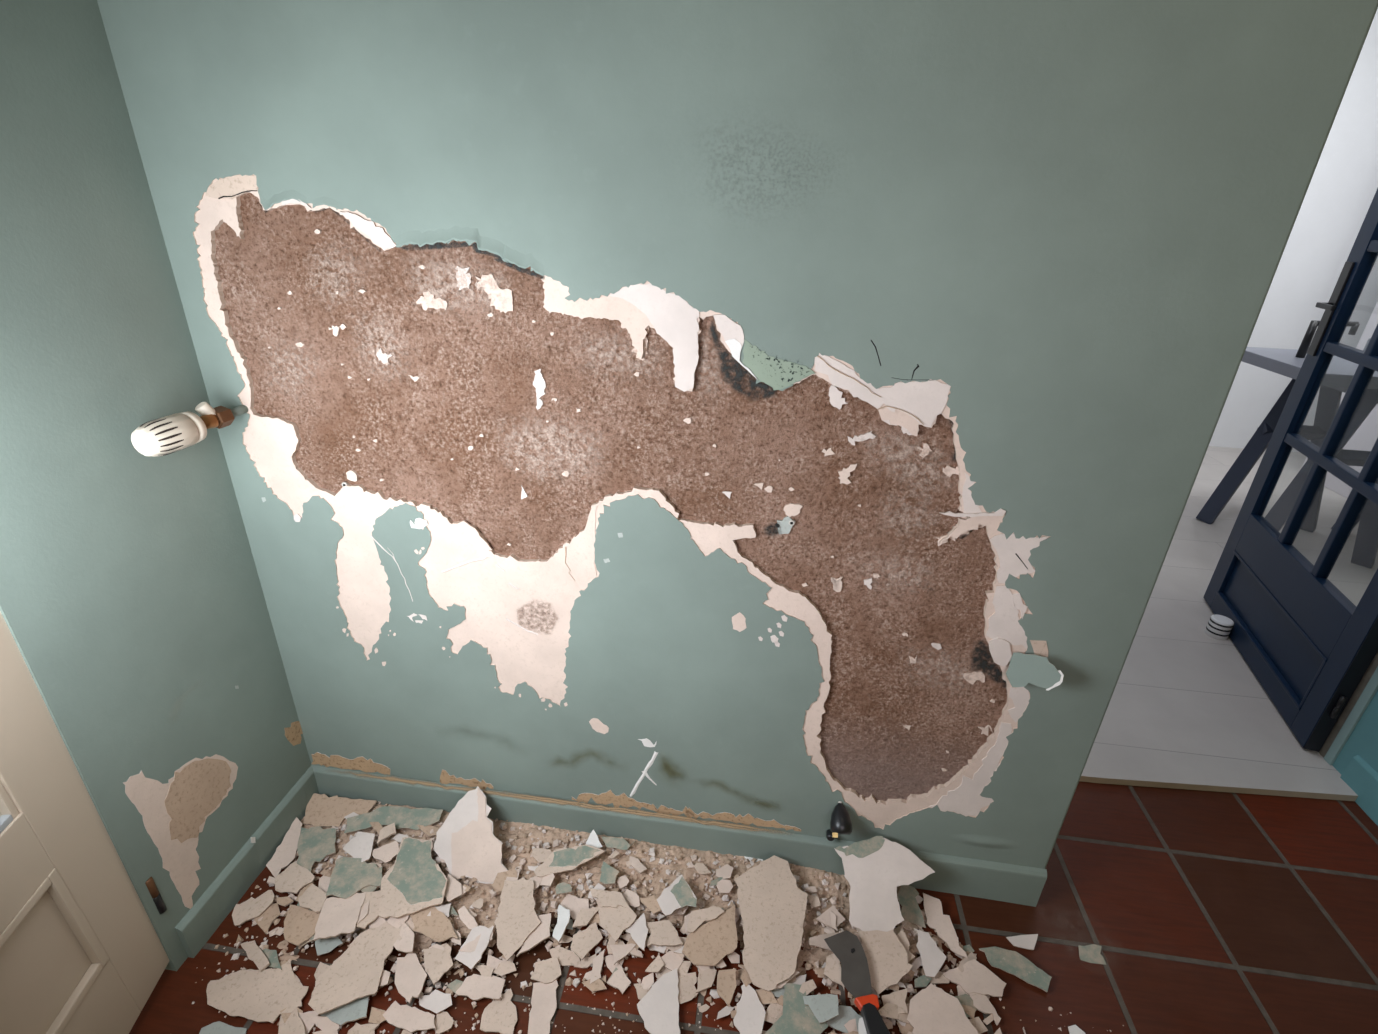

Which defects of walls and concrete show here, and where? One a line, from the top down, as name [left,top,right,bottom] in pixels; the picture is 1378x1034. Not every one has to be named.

peeling [123,754,238,909]
flaking render [194,175,1064,1034]